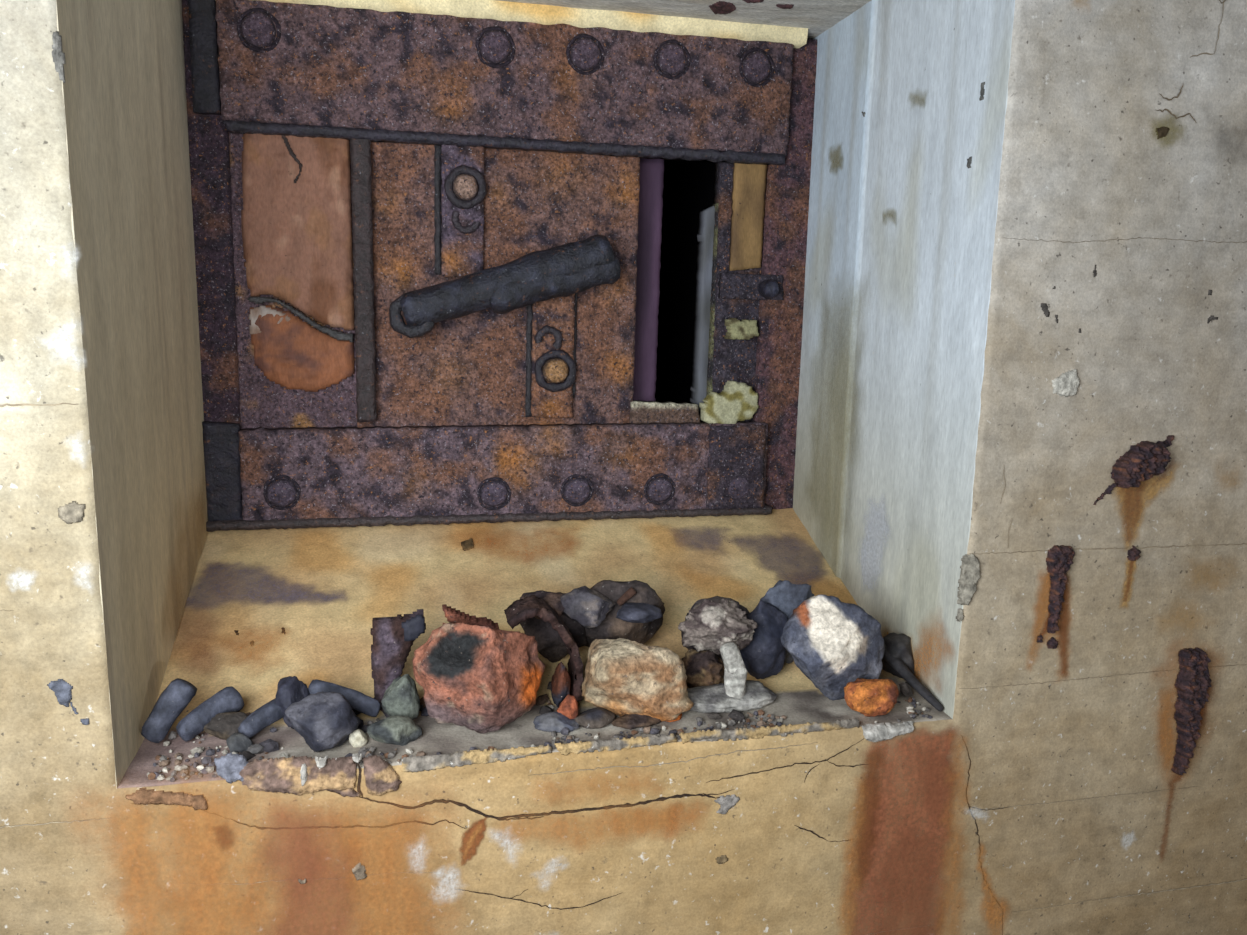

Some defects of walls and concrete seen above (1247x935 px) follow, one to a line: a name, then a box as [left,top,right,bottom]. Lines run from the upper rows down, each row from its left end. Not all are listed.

crack [1191,0,1224,57]
corrosion [250,305,355,392]
corrosion [1093,435,1175,607]
corrosion [1036,545,1075,674]
crack [0,739,868,830]
corrosion [460,818,486,865]
crack [794,825,850,842]
corrosion [847,731,957,935]
crack [962,737,1198,934]
corrosion [1161,647,1212,857]